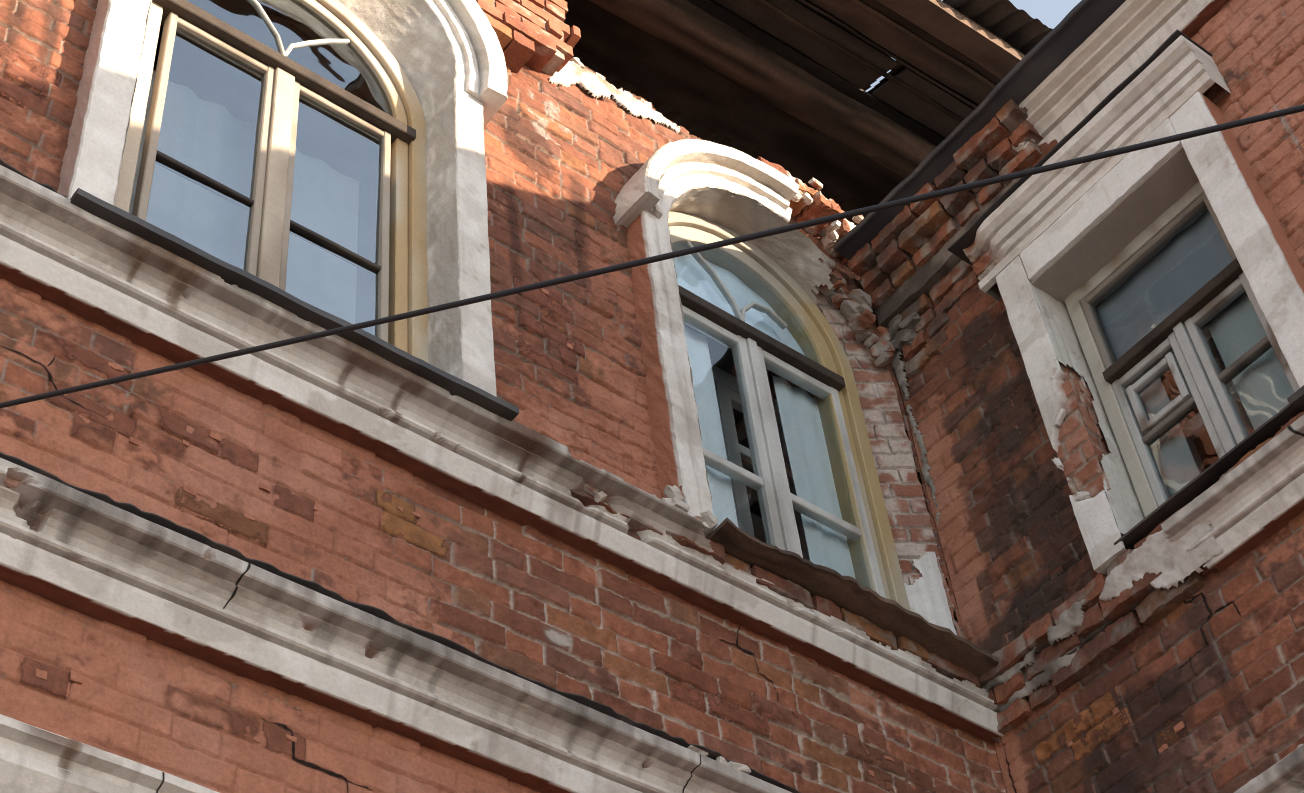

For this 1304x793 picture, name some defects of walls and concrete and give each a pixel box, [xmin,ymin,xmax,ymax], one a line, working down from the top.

spalling [549,57,681,134]
peeling [827,215,864,242]
flaking render [811,258,961,637]
flaking render [1050,363,1111,501]
crack [1288,425,1304,437]
crack [223,563,251,609]
flaking render [570,483,1223,743]
crack [262,718,371,793]
crack [683,754,701,793]
flaking render [687,745,751,774]